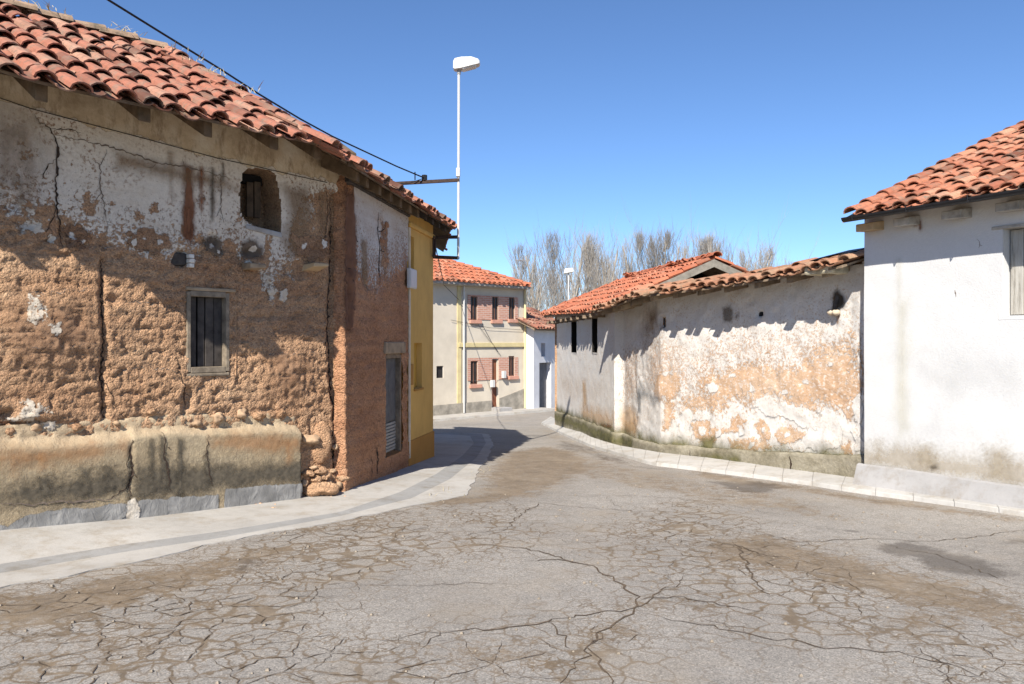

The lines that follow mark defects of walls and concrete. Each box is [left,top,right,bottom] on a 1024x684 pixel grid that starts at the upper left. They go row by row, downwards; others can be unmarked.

crack [35,116,230,246]
water stain [121,158,224,218]
peeling [13,199,92,250]
peeling [126,227,171,255]
water stain [345,189,368,331]
peeling [27,293,62,336]
crack [7,259,190,416]
crack [245,190,386,458]
peeling [618,291,864,455]
peeling [6,398,56,431]
crack [111,440,137,500]
water stain [864,449,1024,482]